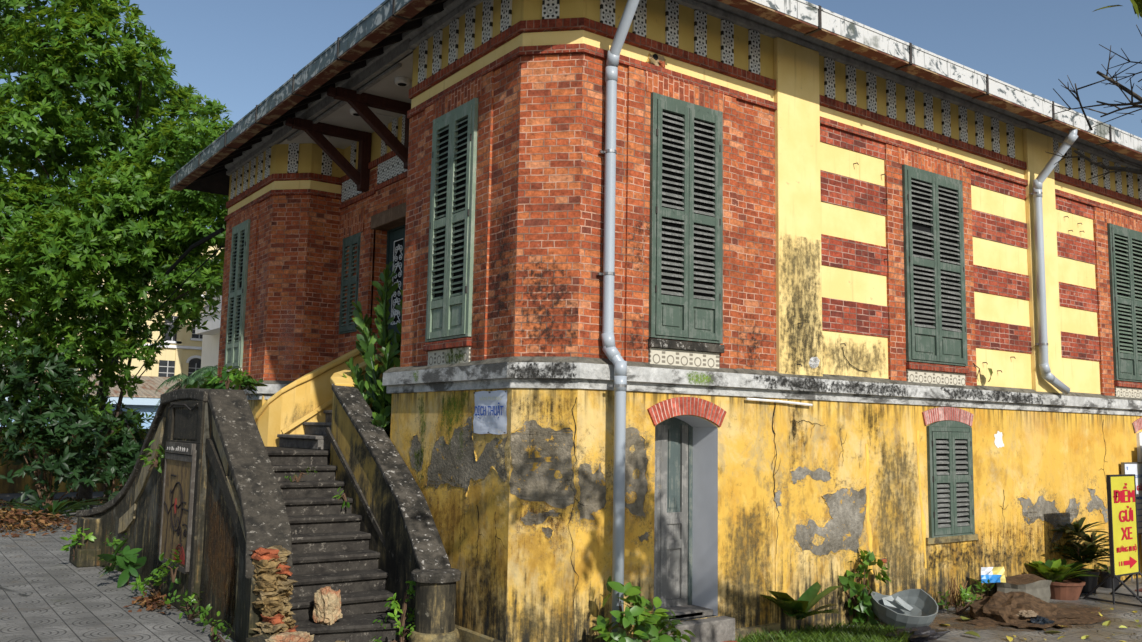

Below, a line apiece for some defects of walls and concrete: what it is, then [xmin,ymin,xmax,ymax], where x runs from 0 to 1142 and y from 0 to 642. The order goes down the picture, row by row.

flaking render [646,53,666,68]
damp [742,237,908,429]
damp [469,547,505,625]
peeling [409,408,655,547]
damp [725,509,769,626]
peeling [774,463,873,565]
damp [876,441,1076,587]
peeling [1015,483,1108,544]